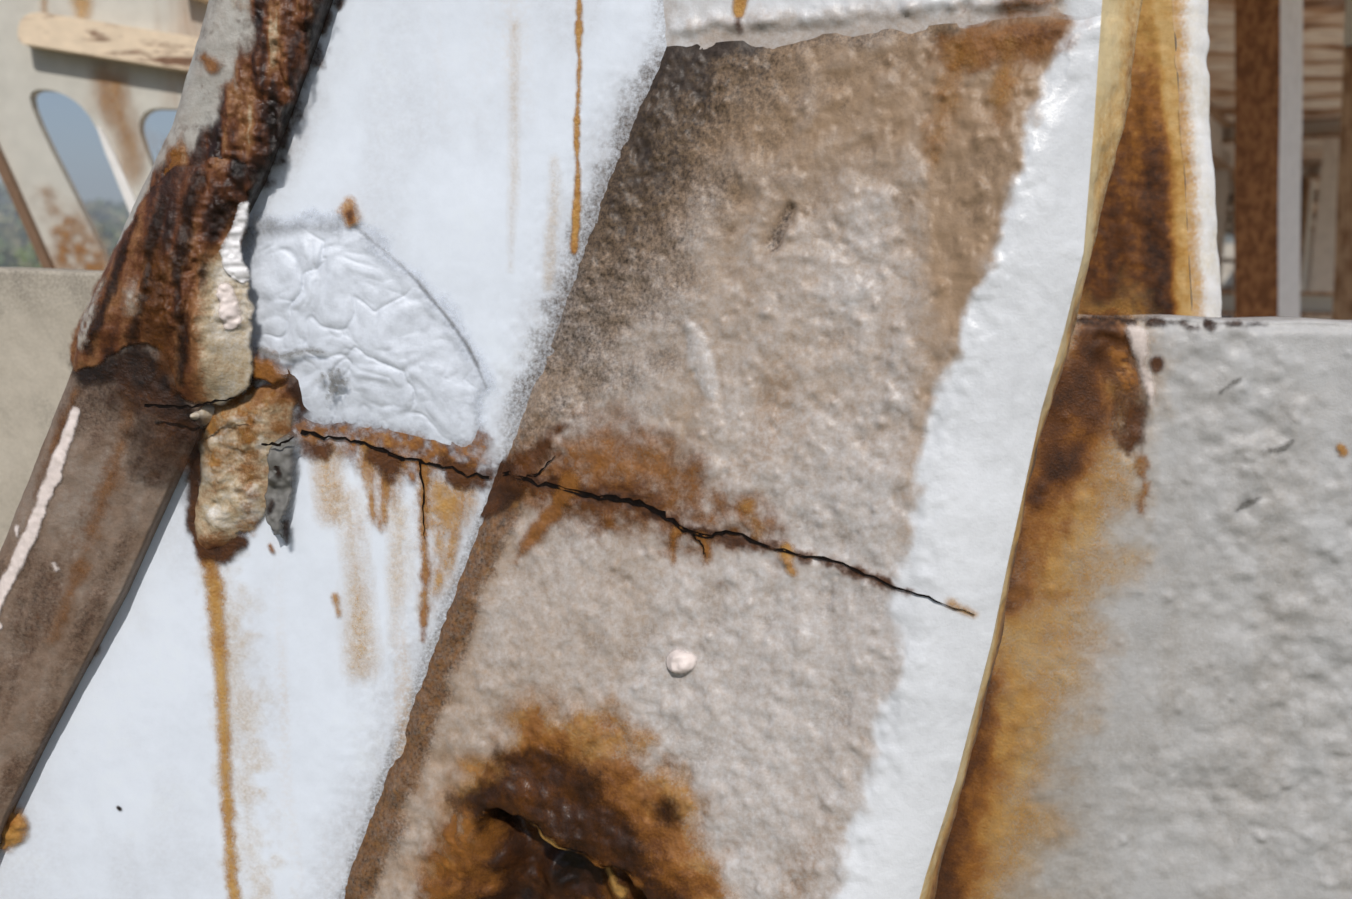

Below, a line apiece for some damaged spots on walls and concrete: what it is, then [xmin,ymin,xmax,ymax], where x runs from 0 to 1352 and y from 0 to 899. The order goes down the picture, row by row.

corrosion [733,0,747,32]
peeling [216,203,250,330]
corrosion [340,198,359,226]
corrosion [570,0,583,254]
corrosion [144,358,911,899]
crack [300,430,975,615]
corrosion [935,302,1261,899]